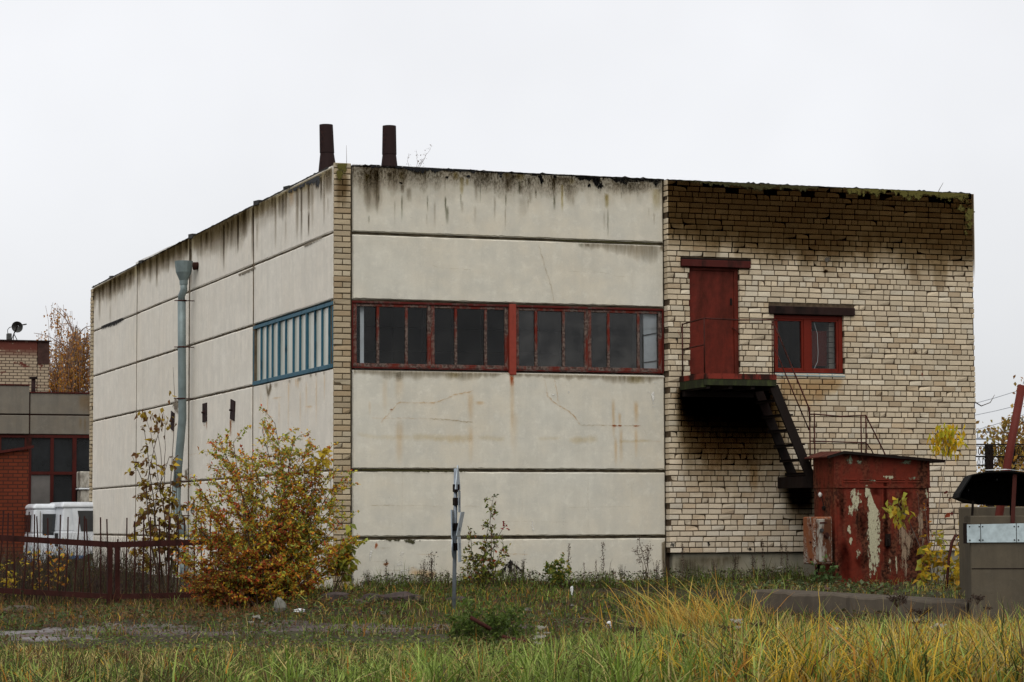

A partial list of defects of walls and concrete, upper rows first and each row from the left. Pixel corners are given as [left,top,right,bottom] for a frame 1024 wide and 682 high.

leakage [91,194,283,292]
leakage [301,164,975,270]
peeling [847,476,924,581]